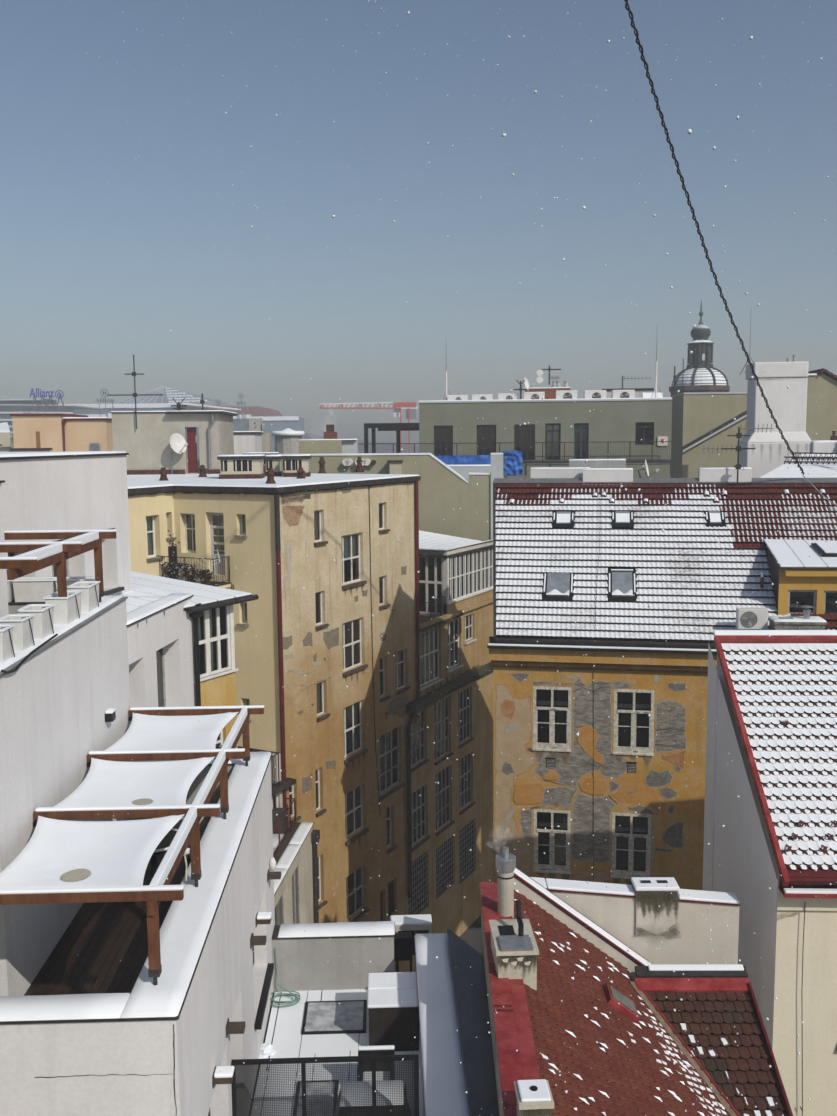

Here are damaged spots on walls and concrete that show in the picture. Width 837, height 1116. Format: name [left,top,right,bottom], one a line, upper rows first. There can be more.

spalling [282,505,305,527]
peeling [414,664,489,723]
peeling [493,673,687,883]
damp [613,878,680,916]